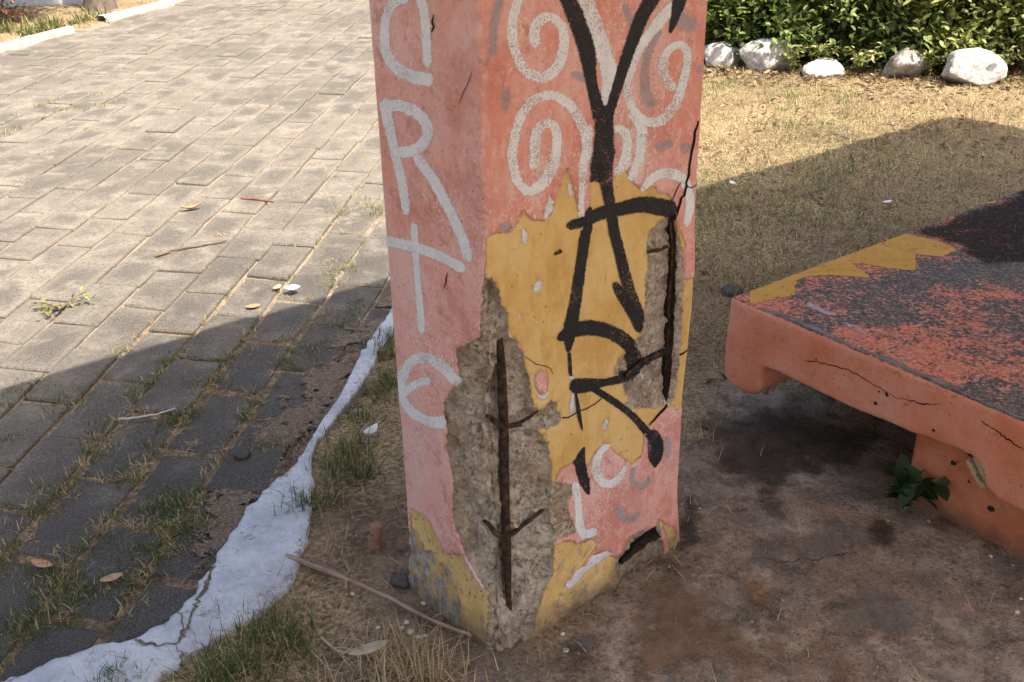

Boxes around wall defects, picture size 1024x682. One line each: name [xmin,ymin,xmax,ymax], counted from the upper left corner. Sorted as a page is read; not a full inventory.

crack [671,121,699,220]
peeling [409,168,693,652]
crack [807,361,939,405]
spalling [966,453,987,489]